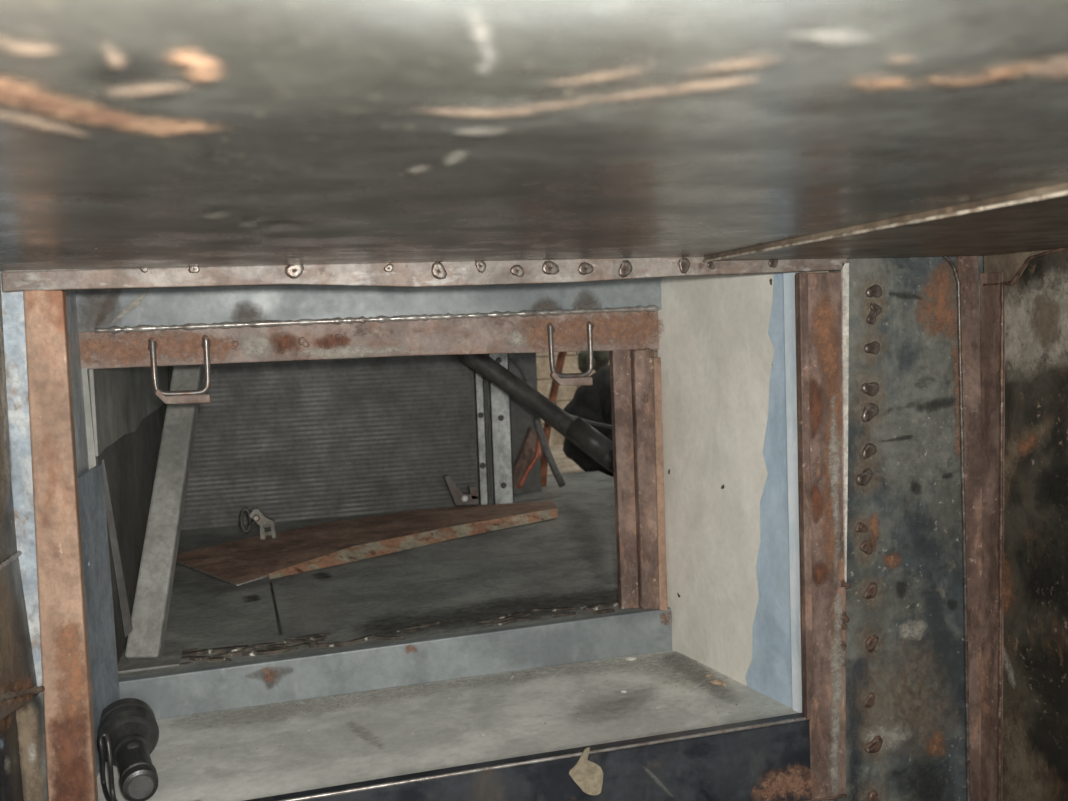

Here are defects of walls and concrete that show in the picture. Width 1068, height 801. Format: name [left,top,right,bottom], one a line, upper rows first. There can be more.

corrosion [80,332,234,365]
corrosion [274,335,296,352]
corrosion [317,335,348,348]
leakage [1005,273,1068,373]
corrosion [810,300,843,584]
corrosion [49,623,91,801]
corrosion [753,766,819,801]
corrosion [1002,714,1048,801]